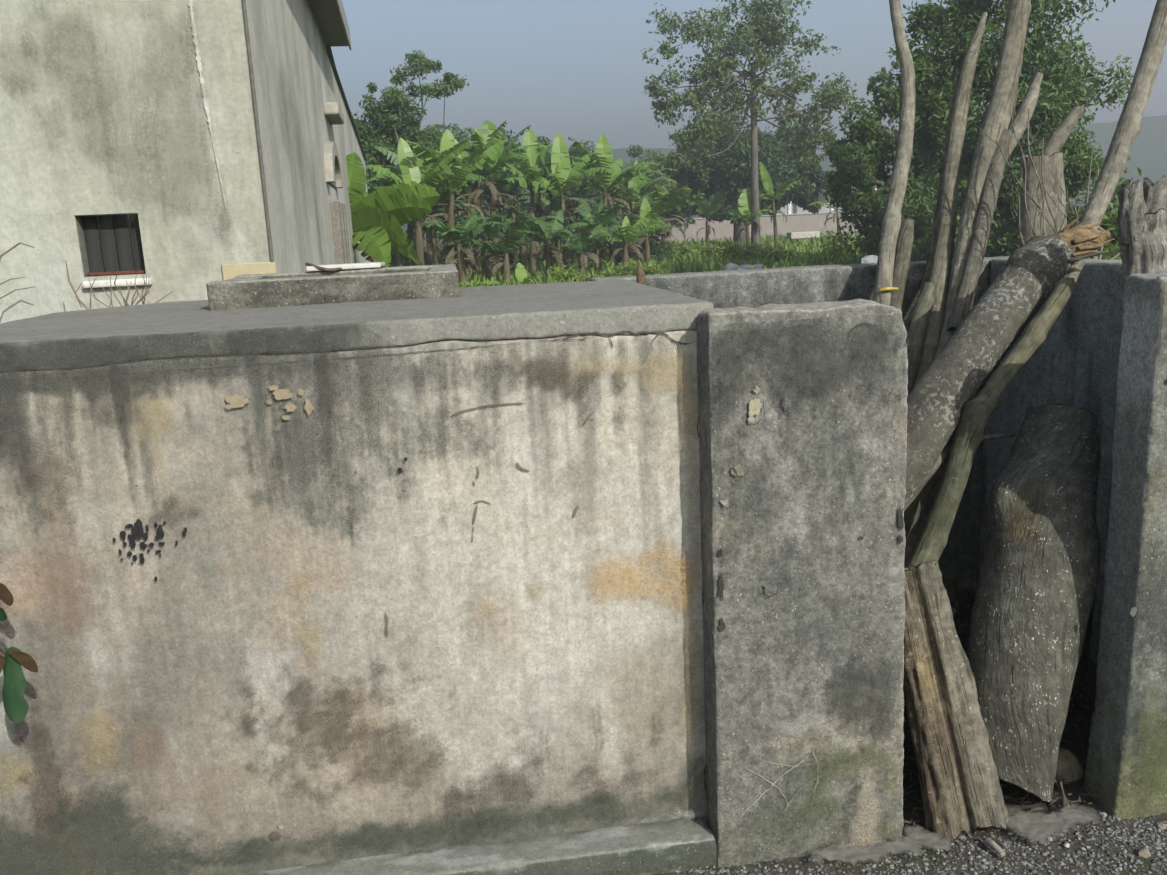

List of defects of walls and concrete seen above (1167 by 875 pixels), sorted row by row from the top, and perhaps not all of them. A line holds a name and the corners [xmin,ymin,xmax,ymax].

leakage [0,363,282,523]
peeling [225,394,249,409]
peeling [265,385,314,420]
crack [11,331,697,379]
leakage [477,344,693,436]
spalling [747,385,765,425]
leakage [243,664,443,798]
leakage [0,706,708,875]